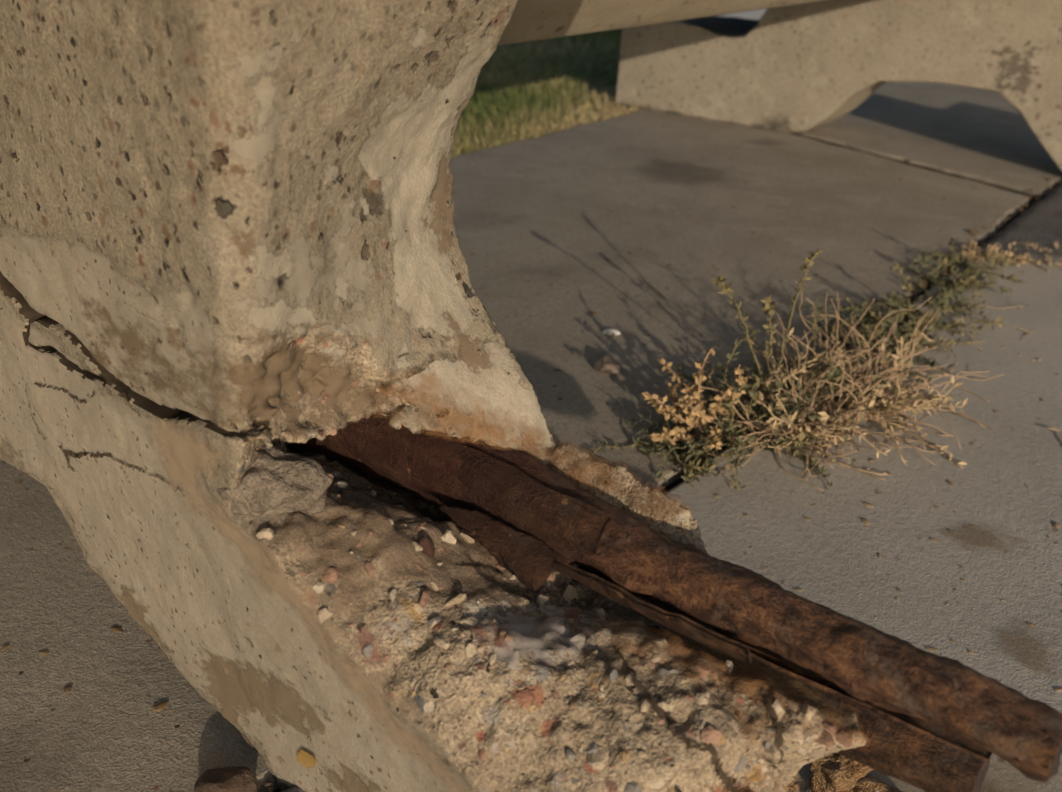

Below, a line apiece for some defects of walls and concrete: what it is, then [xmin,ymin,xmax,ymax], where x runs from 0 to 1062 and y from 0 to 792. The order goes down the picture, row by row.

peeling [230,29,303,167]
peeling [321,163,340,185]
peeling [349,35,494,338]
peeling [248,244,296,281]
crack [0,272,272,497]
peeling [235,295,706,553]
peeling [195,650,331,747]
spalling [231,491,867,792]
crack [615,652,739,792]
crack [759,689,785,769]